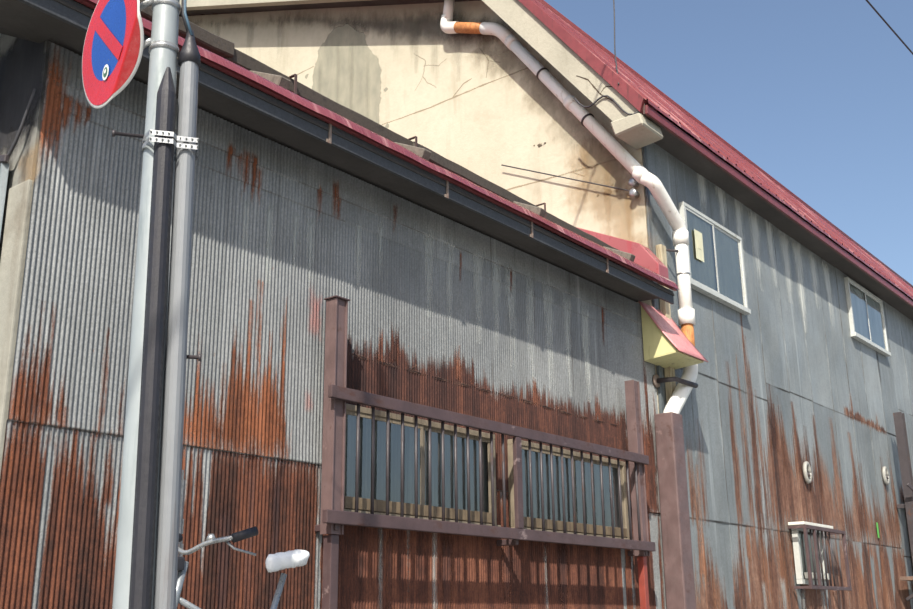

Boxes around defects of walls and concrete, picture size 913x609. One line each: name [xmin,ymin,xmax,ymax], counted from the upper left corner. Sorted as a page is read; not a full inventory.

corrosion [40,56,91,153]
peeling [305,24,389,128]
damp [330,15,483,38]
corrosion [228,145,262,193]
corrosion [0,301,121,609]
corrosion [177,305,664,609]
corrosion [687,313,913,609]